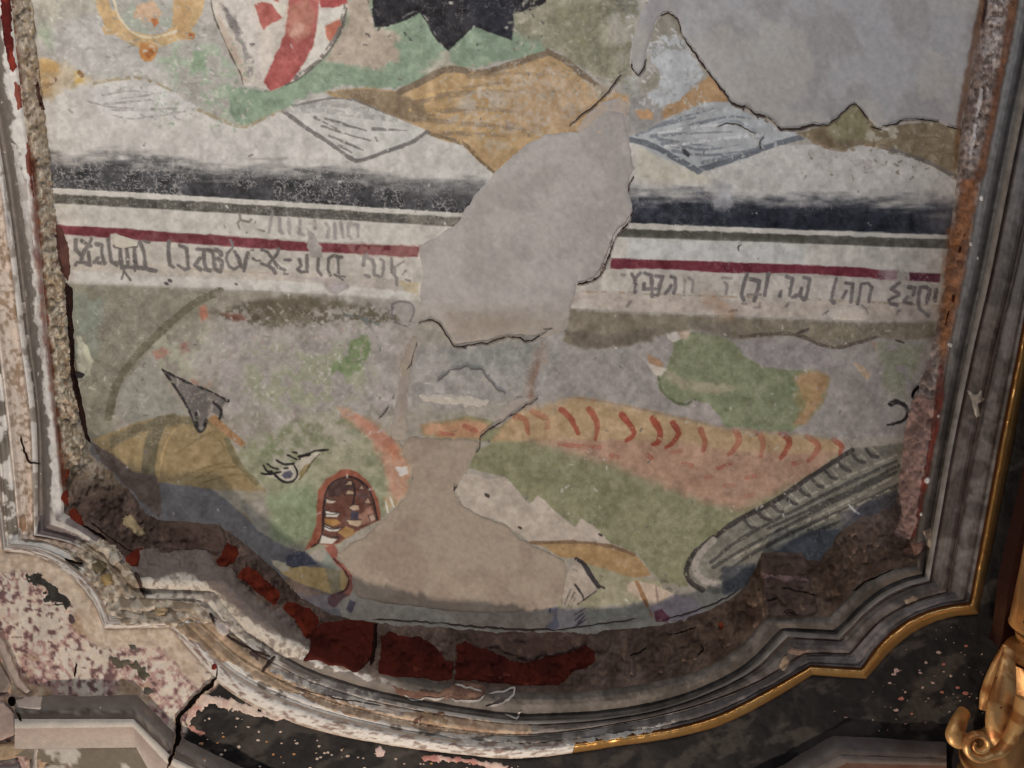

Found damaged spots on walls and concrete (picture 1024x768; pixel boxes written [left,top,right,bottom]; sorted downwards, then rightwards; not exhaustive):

peeling [14,82,23,110]
flaking render [36,76,55,110]
peeling [1,142,36,269]
peeling [21,296,49,392]
flaking render [55,224,91,443]
flaking render [61,469,84,525]
flaking render [894,394,936,559]
flaking render [0,634,67,768]
crack [167,667,218,768]
flaking render [64,515,676,768]